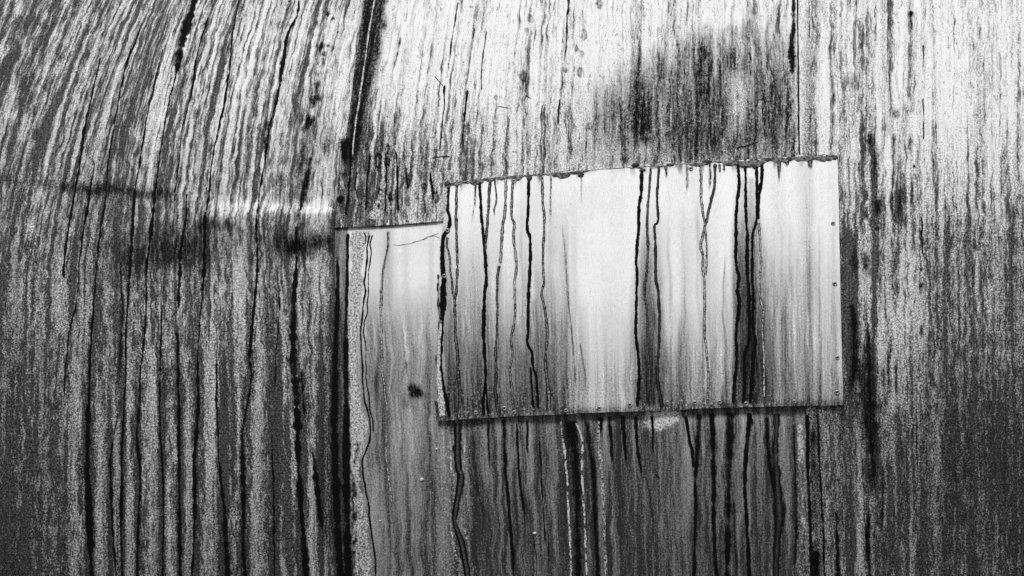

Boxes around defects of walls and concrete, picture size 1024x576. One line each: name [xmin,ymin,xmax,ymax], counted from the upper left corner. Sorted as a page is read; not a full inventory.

water stain [593,0,810,161]
rust [560,166,668,576]
rust [684,158,798,576]